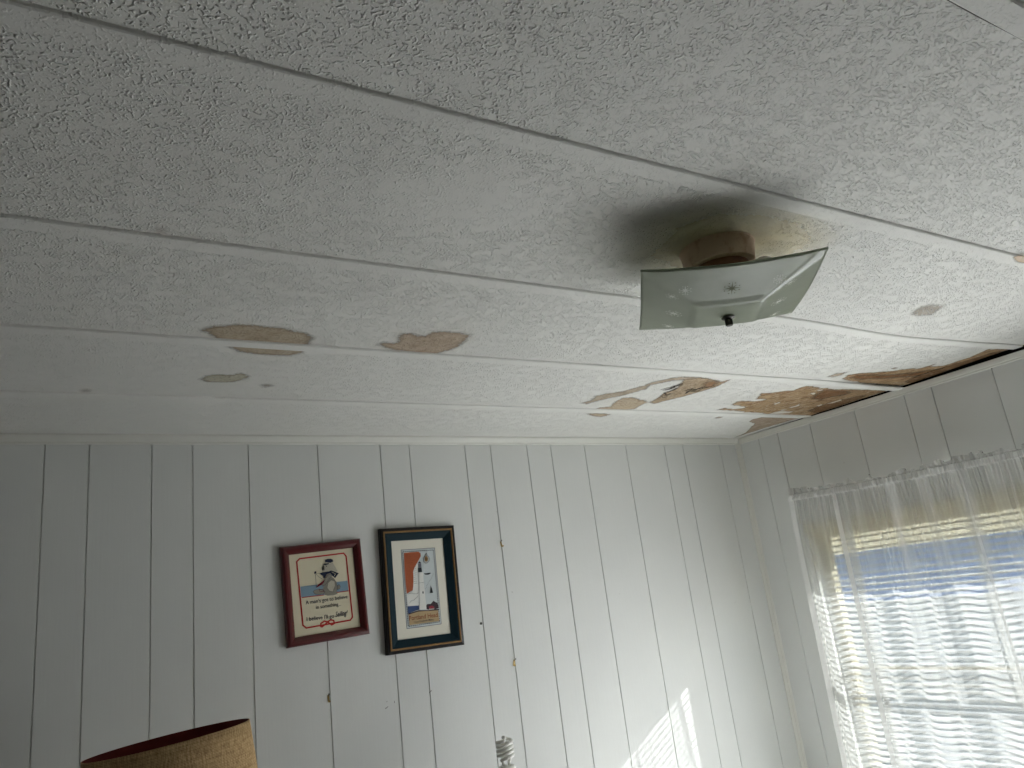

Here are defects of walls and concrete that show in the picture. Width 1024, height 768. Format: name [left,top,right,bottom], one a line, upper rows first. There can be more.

peeling [719,349,1009,436]